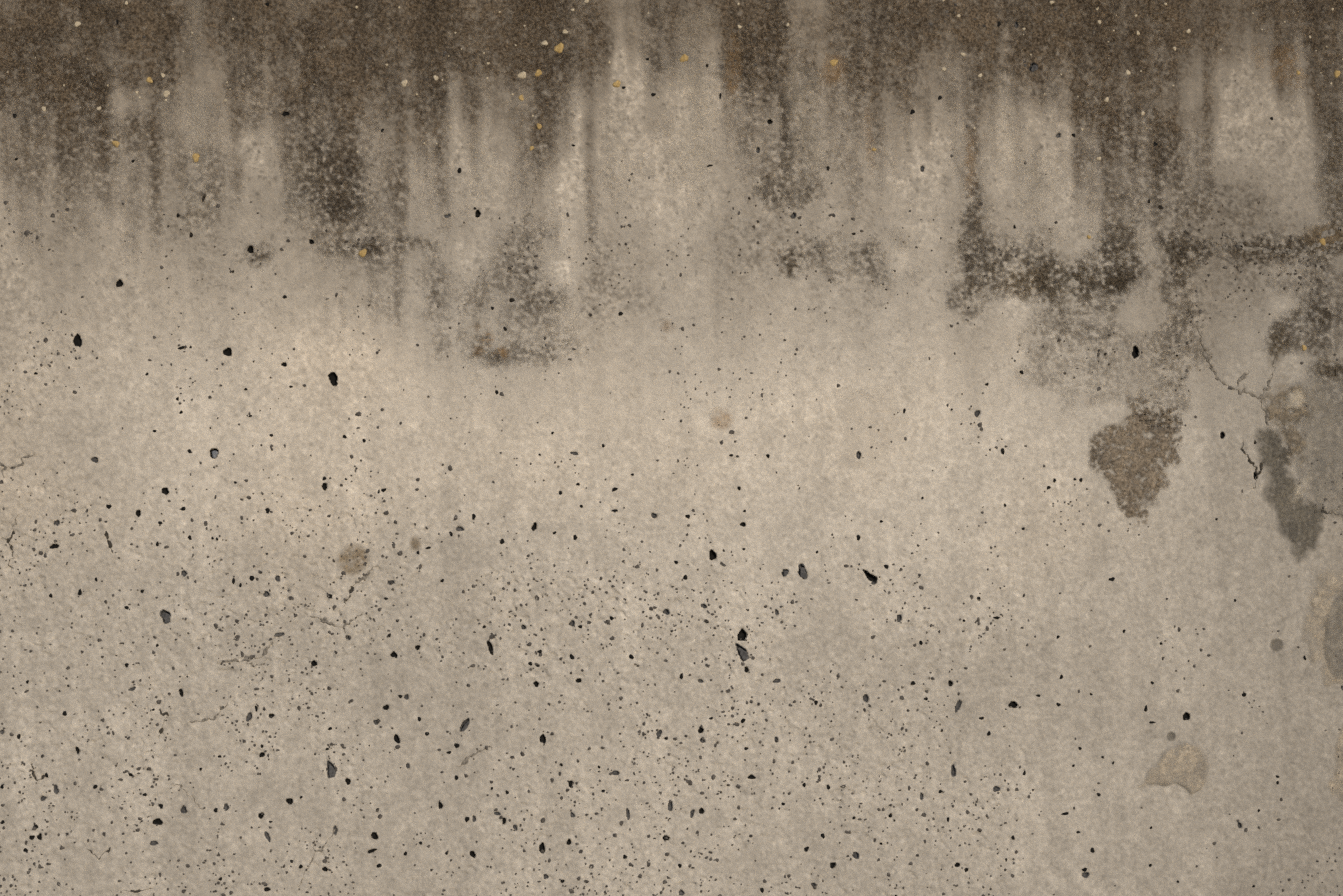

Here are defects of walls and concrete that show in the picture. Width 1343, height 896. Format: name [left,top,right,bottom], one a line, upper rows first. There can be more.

water stain [0,0,613,264]
water stain [629,0,1343,278]
water stain [950,221,1130,314]
water stain [1269,333,1287,359]
water stain [1317,362,1343,377]
spalling [1091,400,1182,517]